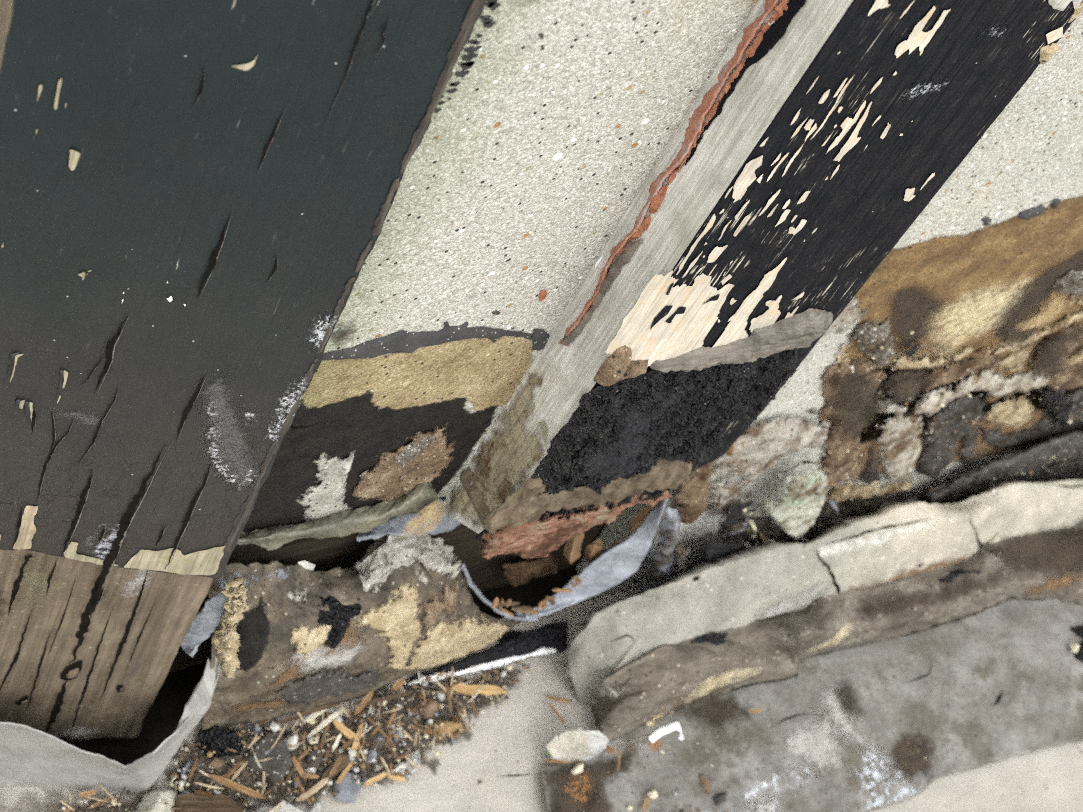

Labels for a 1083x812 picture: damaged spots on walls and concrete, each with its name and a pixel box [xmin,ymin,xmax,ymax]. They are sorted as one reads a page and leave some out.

peeling [895,6,951,58]
crack [196,215,232,300]
peeling [605,72,903,367]
water stain [817,196,1083,443]
spalling [877,269,1083,481]
crack [0,314,215,737]
peeling [64,542,225,575]
water stain [764,582,828,618]
crack [817,517,933,594]
crack [963,505,994,554]
water stain [786,685,873,771]
water stain [544,756,631,812]